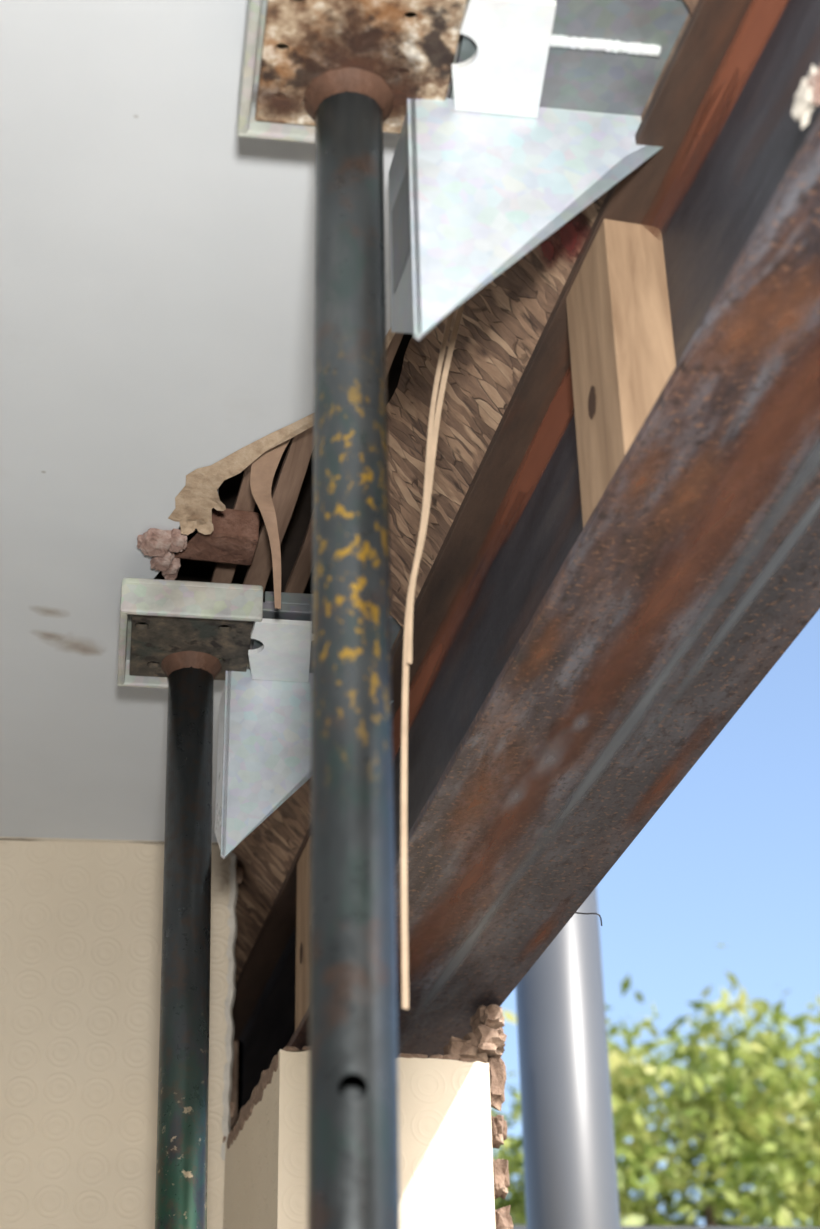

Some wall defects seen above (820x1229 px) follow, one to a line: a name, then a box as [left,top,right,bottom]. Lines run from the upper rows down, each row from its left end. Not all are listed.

rust [255,89,299,113]
rust [307,25,415,118]
rust [679,0,789,179]
spalling [137,508,259,580]
rust [492,365,574,548]
rust [392,583,473,761]
spalling [398,1004,514,1229]